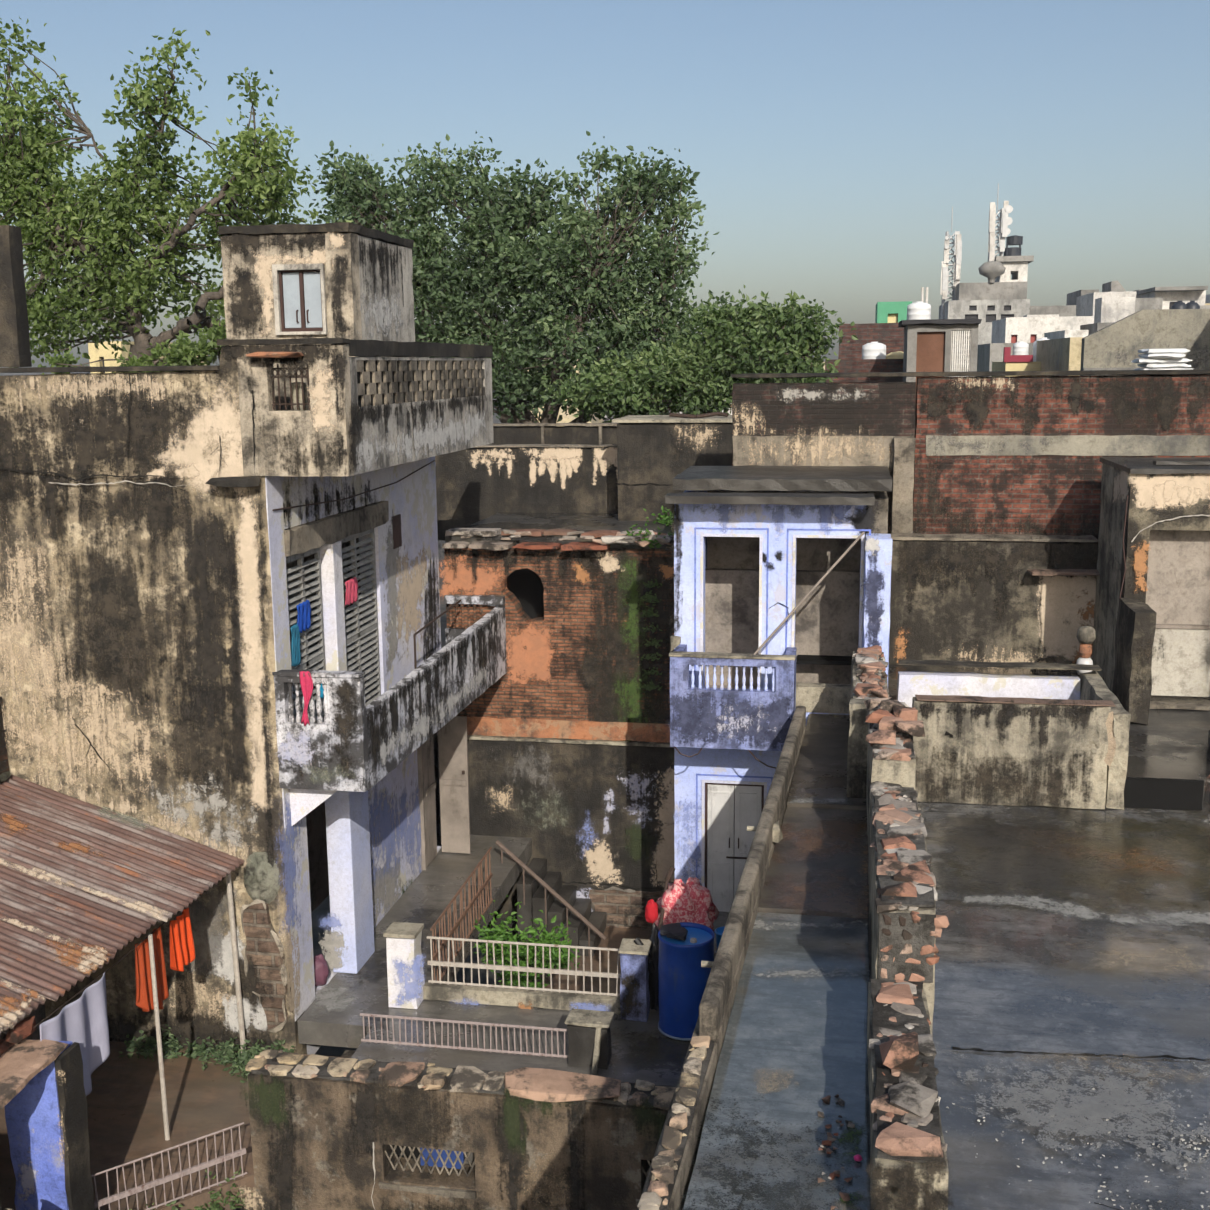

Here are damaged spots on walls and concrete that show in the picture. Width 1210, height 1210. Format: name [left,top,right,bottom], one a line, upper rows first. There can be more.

peeling [356,408,617,489]
damp [918,344,1210,453]
damp [0,232,487,866]
damp [861,457,1099,647]
flaking render [1133,540,1150,592]
damp [294,504,793,785]
peeling [380,668,487,765]
corrosion [0,858,168,918]
flaking render [576,766,701,930]
damp [916,700,1210,914]
corrosion [0,981,45,1017]
corrosion [0,918,110,975]